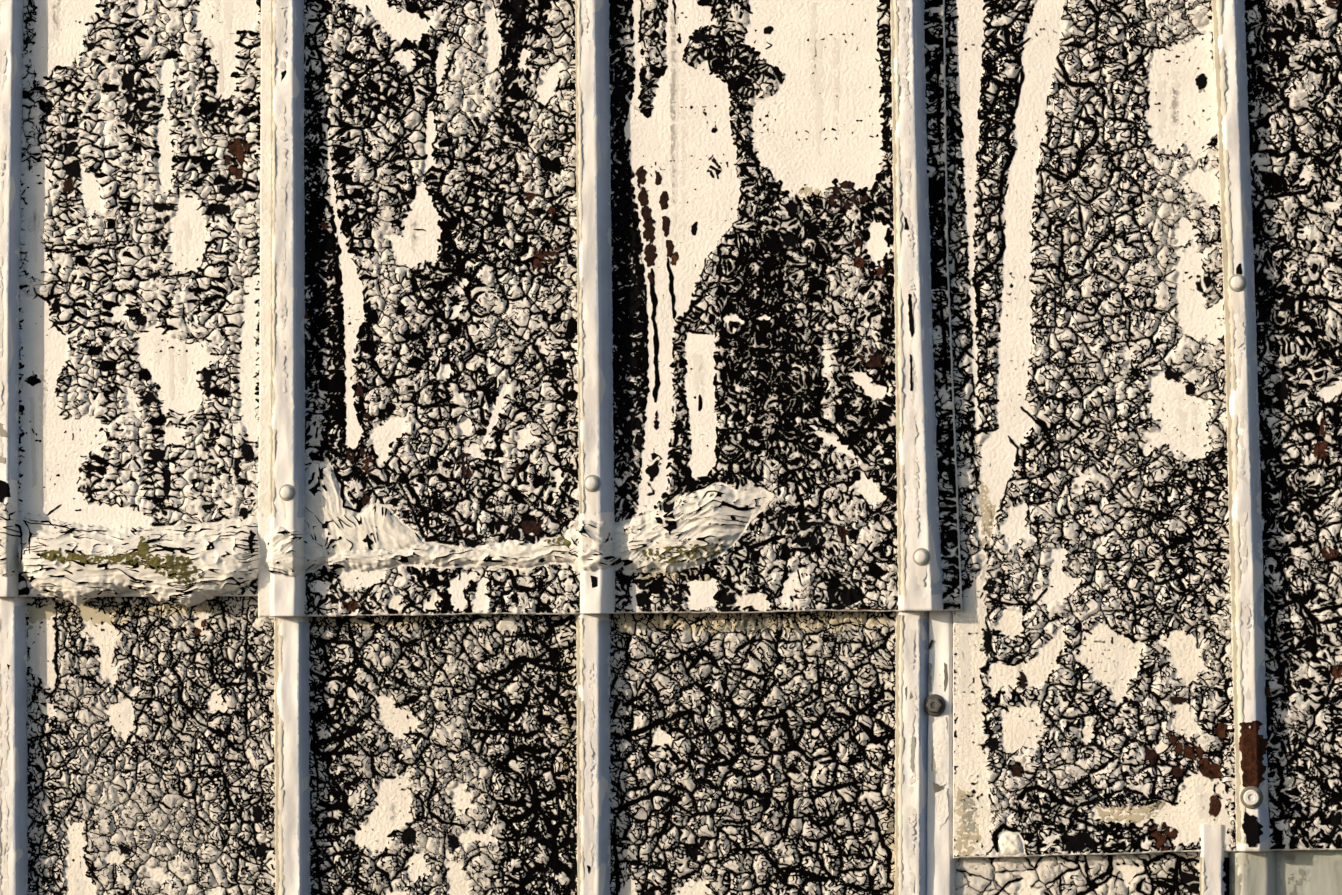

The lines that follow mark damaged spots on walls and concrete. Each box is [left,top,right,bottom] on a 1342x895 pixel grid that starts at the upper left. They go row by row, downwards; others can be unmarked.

peeling [345,0,432,72]
peeling [744,0,884,216]
peeling [381,178,443,270]
rust [636,167,678,284]
peeling [0,127,219,529]
crack [0,0,898,895]
crack [924,0,1342,895]
peeling [928,477,1212,856]
rust [1145,748,1159,766]
rust [1166,733,1222,779]
rust [1209,796,1221,816]
rust [1214,720,1267,788]